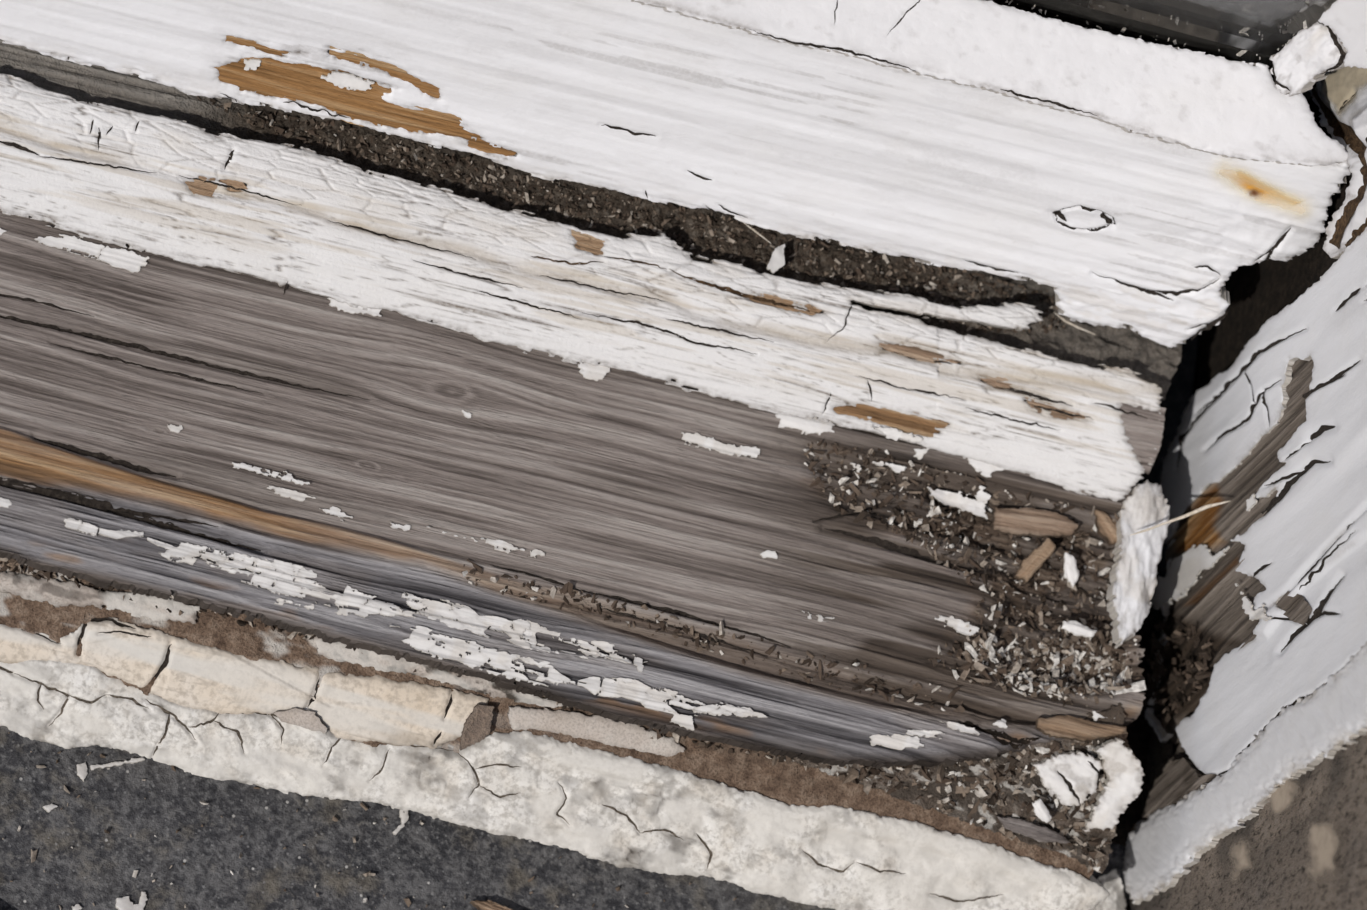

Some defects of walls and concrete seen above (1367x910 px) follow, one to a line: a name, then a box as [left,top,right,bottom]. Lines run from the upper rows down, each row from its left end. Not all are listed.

peeling [214,35,516,156]
corrosion [1229,172,1300,205]
peeling [34,234,149,273]
peeling [775,404,949,473]
peeling [927,458,1005,520]
peeling [64,518,767,734]
peeling [1149,359,1314,745]
crack [1253,563,1271,577]
crack [1272,521,1356,652]
crack [0,612,284,755]
crack [308,680,341,763]
crack [372,694,518,798]